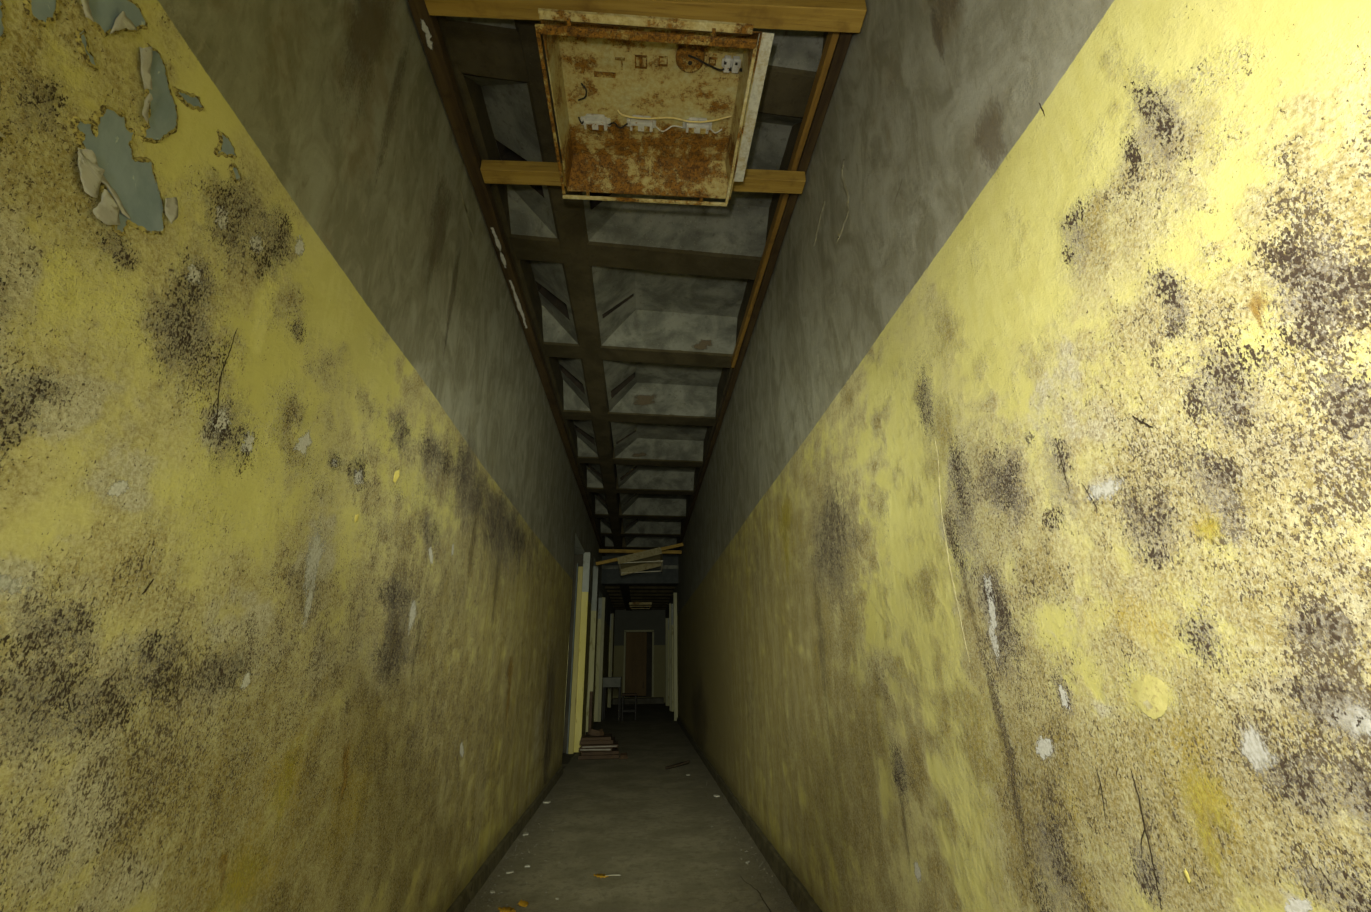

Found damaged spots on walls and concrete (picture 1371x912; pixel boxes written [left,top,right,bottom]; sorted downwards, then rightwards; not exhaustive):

peeling [23,0,59,29]
peeling [69,0,204,237]
water stain [1120,68,1187,178]
water stain [1061,197,1091,270]
water stain [138,155,303,477]
water stain [1152,258,1185,345]
water stain [1174,216,1371,522]
water stain [916,367,1026,570]
water stain [0,603,251,753]
water stain [978,570,1021,669]
water stain [1277,603,1363,654]
water stain [1275,671,1371,739]